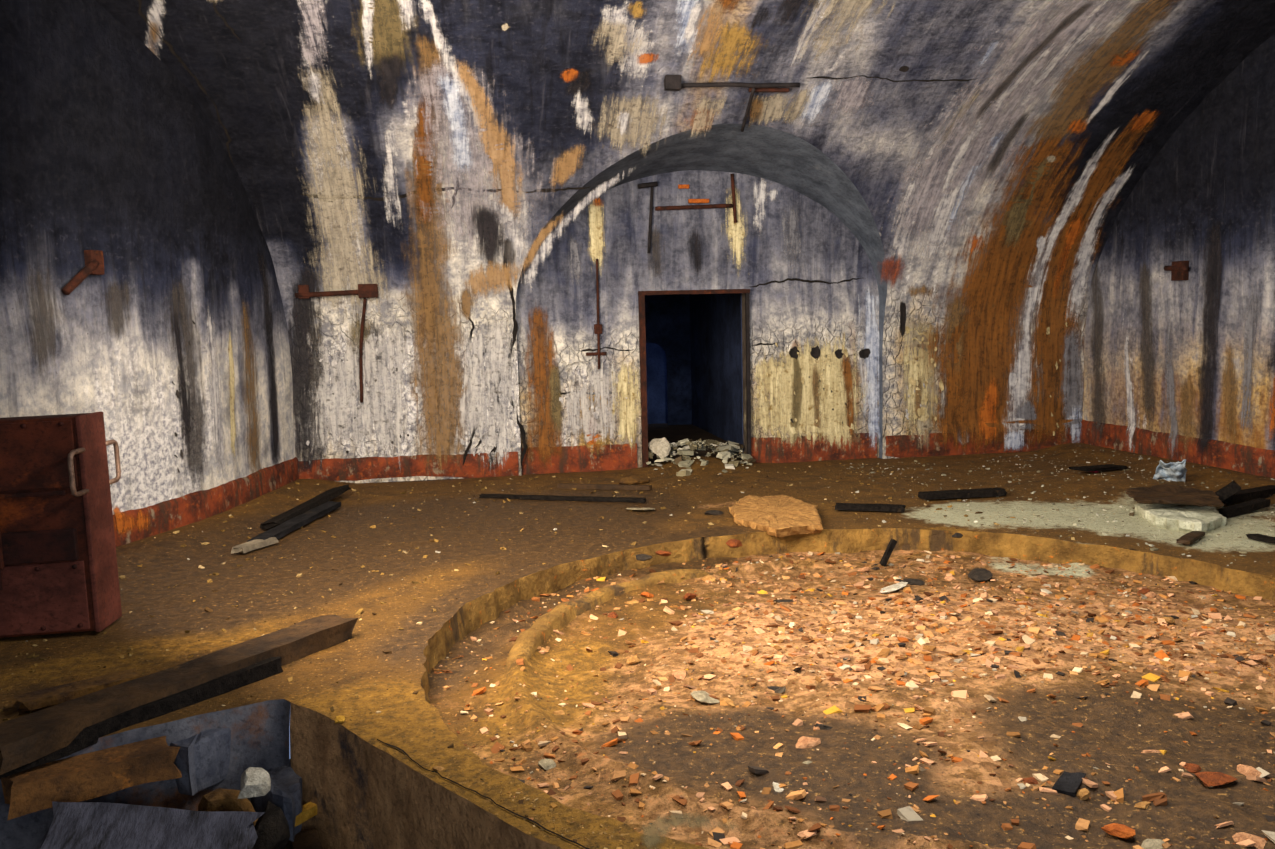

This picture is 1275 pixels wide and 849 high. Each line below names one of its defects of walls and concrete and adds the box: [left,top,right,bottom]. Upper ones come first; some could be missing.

rust [692,98,724,134]
rust [691,9,758,79]
rust [407,38,469,469]
rust [527,309,562,462]
rust [922,0,1171,448]
damp [1062,169,1131,440]
damp [1124,223,1275,458]
rust [114,507,148,533]
crack [377,739,590,849]